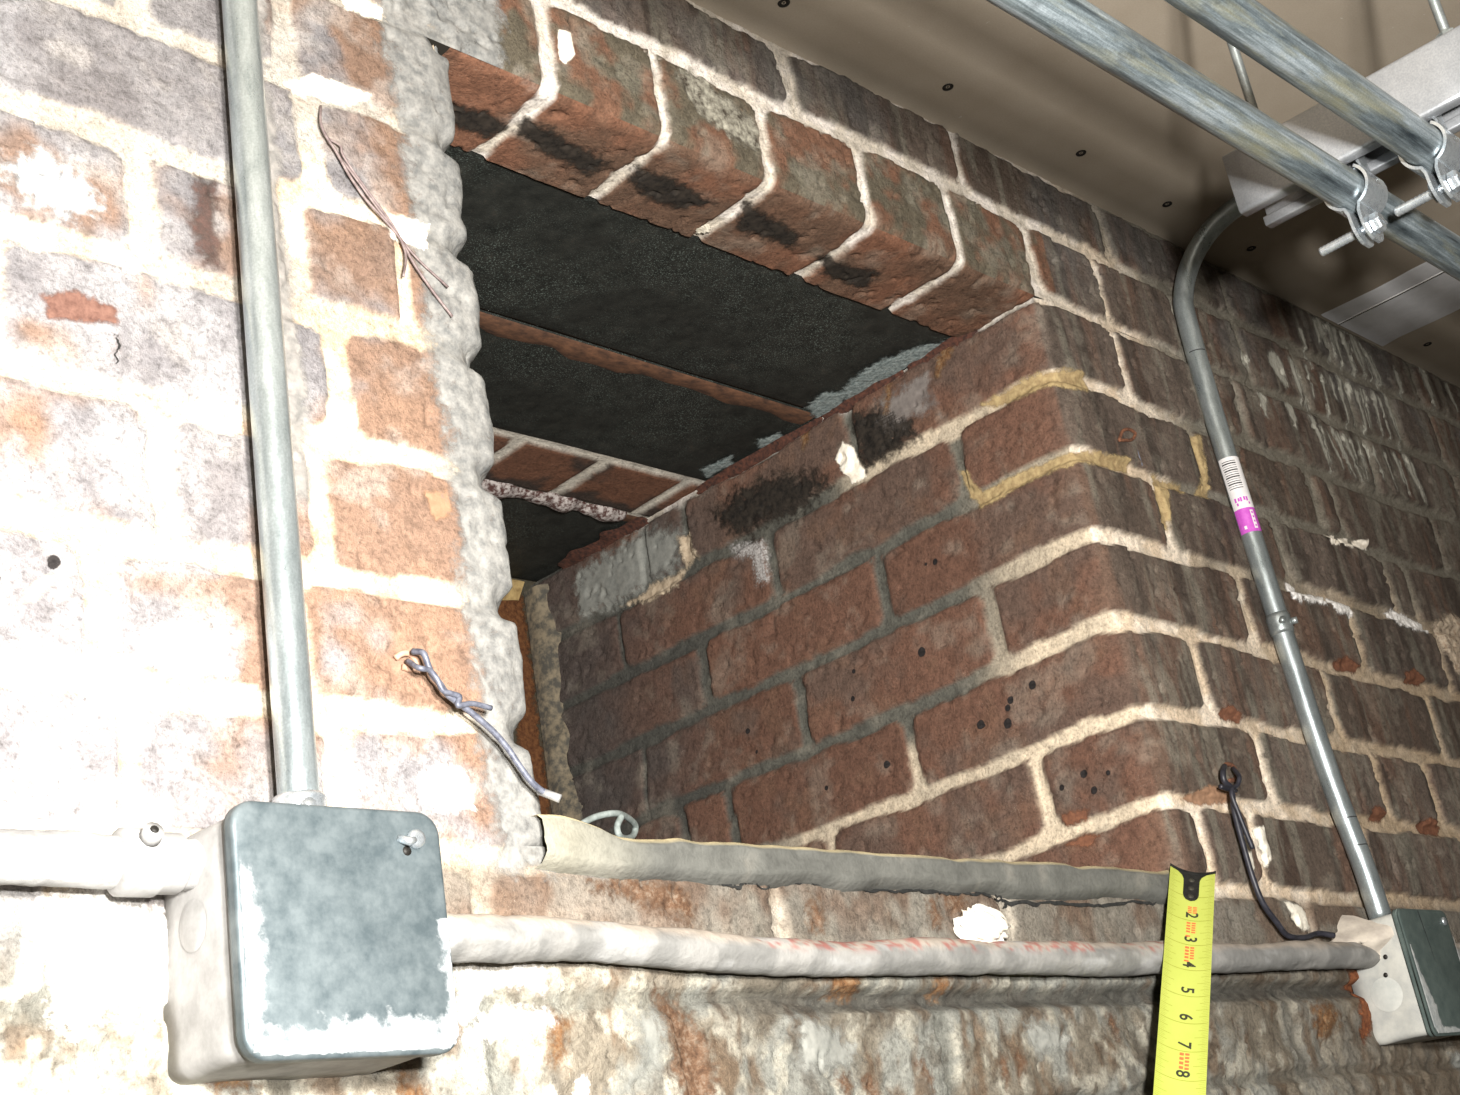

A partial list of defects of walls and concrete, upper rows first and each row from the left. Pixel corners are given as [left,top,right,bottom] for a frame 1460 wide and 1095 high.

damp [1257,316,1426,503]
damp [1418,367,1459,412]
damp [1285,582,1353,619]
damp [1385,609,1429,634]